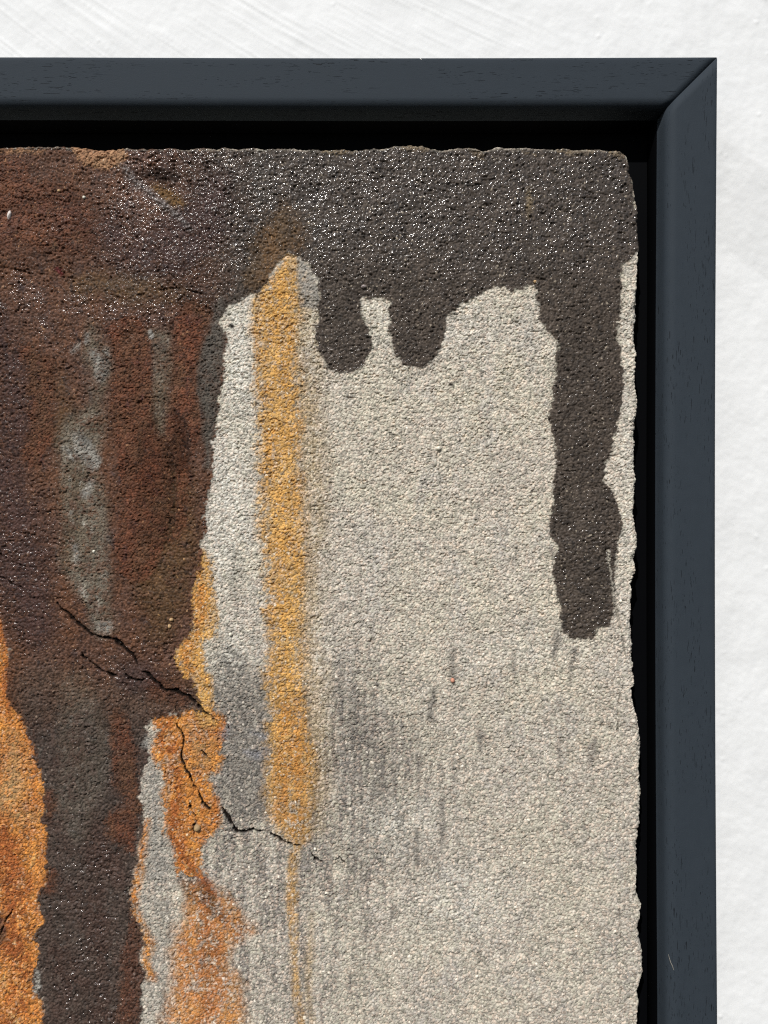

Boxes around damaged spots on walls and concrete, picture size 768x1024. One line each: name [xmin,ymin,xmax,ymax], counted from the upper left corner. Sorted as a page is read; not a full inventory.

rust [0,147,248,1024]
crack [58,603,345,862]
rust [246,206,313,937]
damp [170,146,639,685]